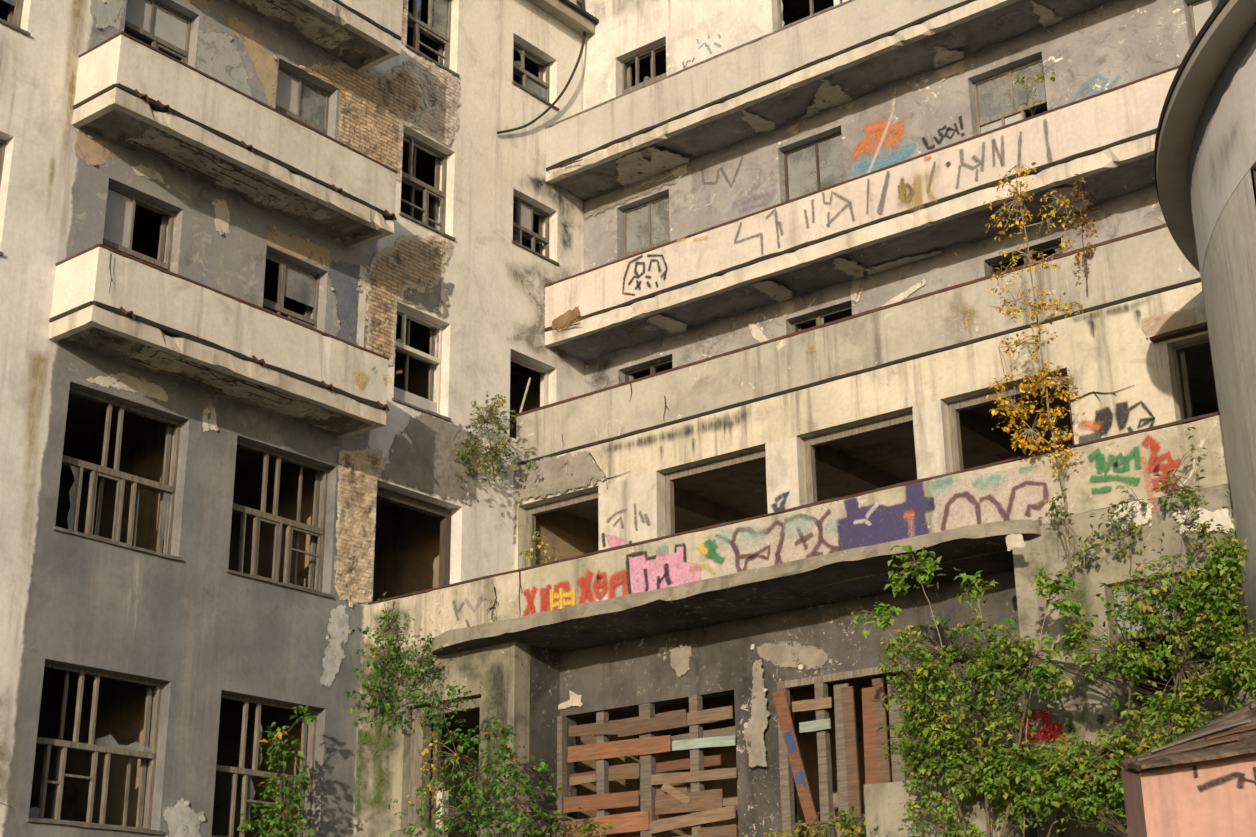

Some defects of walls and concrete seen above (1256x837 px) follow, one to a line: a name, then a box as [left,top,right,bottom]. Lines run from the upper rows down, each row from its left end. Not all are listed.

peeling [90,0,126,31]
flaking render [183,0,460,181]
peeling [799,78,855,121]
peeling [75,131,111,166]
spalling [125,123,331,235]
flaking render [266,225,455,366]
peeling [202,406,218,432]
spalling [86,345,341,422]
flaking render [319,413,482,688]
peeling [1109,498,1154,532]
peeling [1172,489,1236,534]
peeling [742,640,830,768]